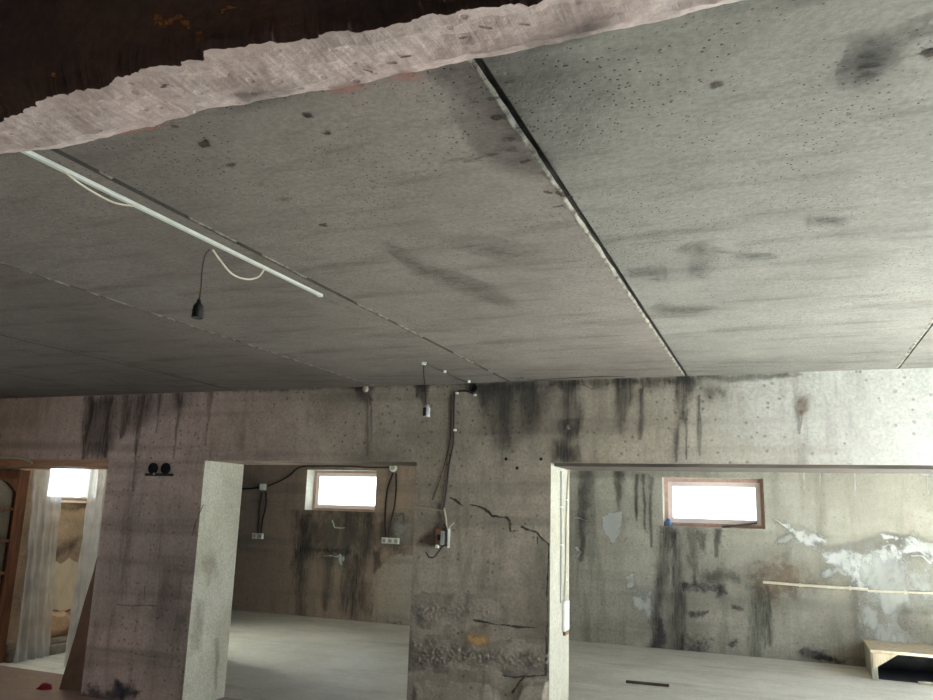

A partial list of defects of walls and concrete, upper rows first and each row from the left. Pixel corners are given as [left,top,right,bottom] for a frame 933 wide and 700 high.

leakage [481,376,722,463]
crack [450,497,549,694]
leakage [579,485,588,561]
leakage [635,474,727,652]
leakage [732,563,798,642]